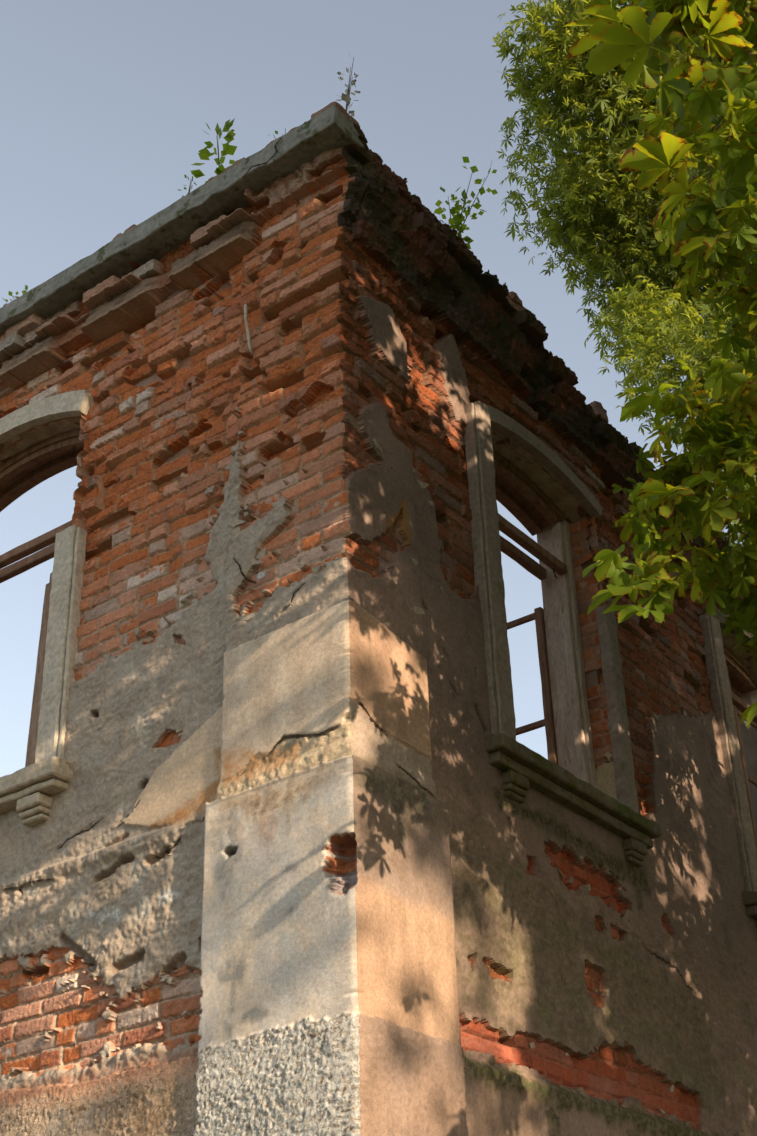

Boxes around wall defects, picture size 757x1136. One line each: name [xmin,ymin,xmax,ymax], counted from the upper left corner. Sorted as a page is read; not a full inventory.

flaking render [0,167,724,1093]
crack [359,702,388,736]
crack [234,725,339,780]
crack [397,764,435,797]
crack [645,947,696,994]
flaking render [459,1013,704,1130]